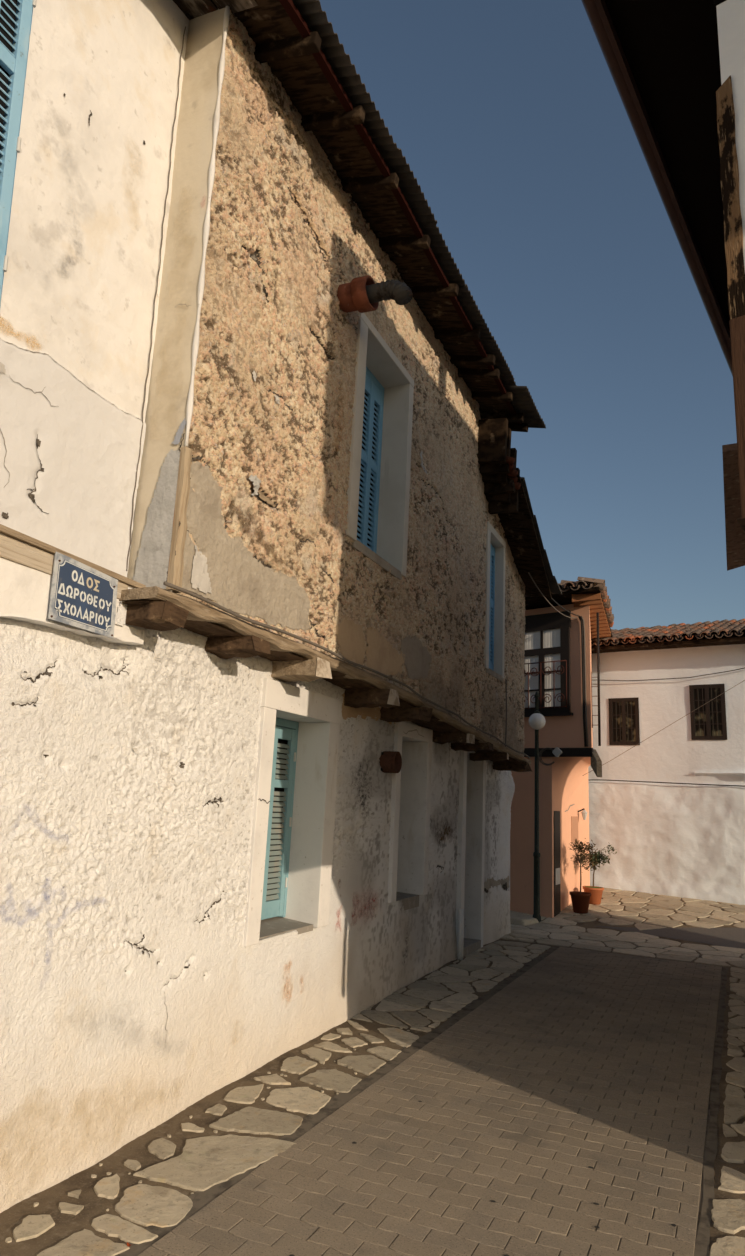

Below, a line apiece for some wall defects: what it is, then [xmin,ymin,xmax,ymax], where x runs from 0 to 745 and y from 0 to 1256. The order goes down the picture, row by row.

crack [0,429,49,514]
spalling [115,418,311,632]
crack [124,934,190,1043]